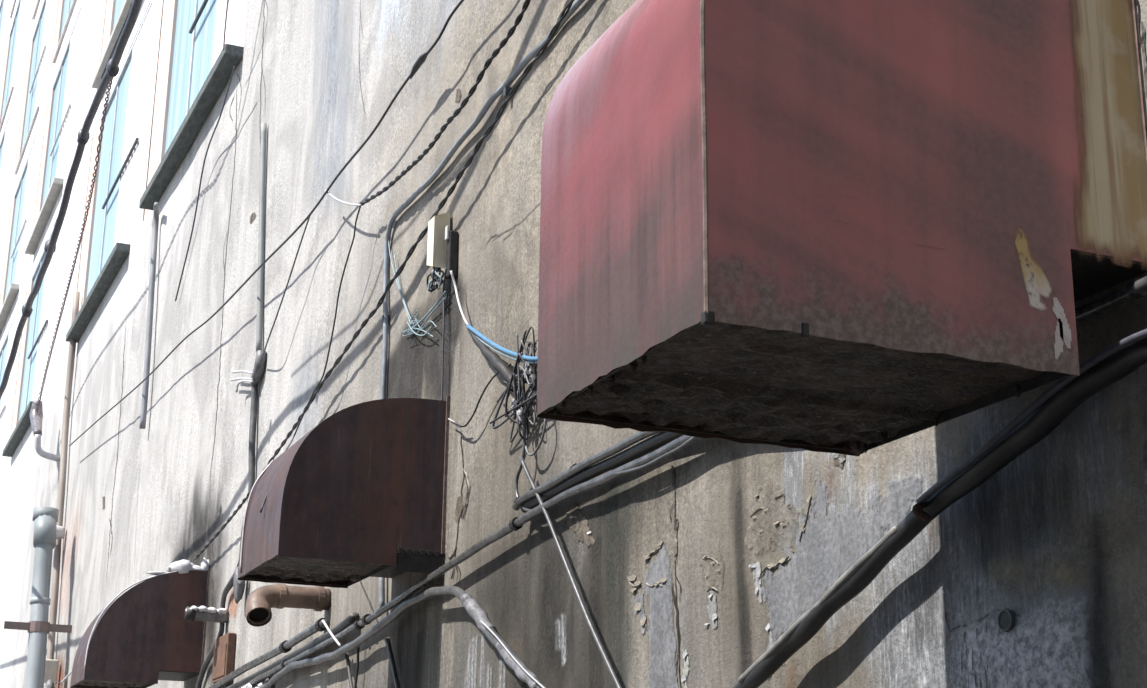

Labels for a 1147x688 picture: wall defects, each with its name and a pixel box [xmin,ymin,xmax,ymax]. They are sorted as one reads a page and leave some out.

peeling [627,541,689,688]
crack [670,465,681,688]
peeling [700,555,721,629]